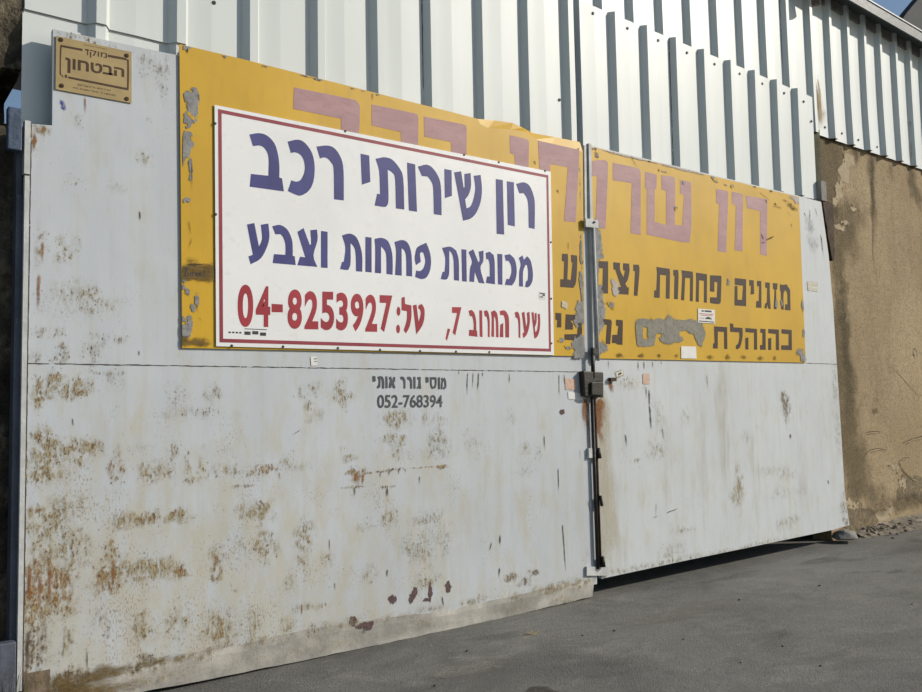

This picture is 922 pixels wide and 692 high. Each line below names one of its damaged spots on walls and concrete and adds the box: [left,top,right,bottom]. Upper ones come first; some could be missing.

leakage [820,136,854,290]
flaking render [832,152,855,206]
flaking render [834,204,857,231]
leakage [834,303,922,511]